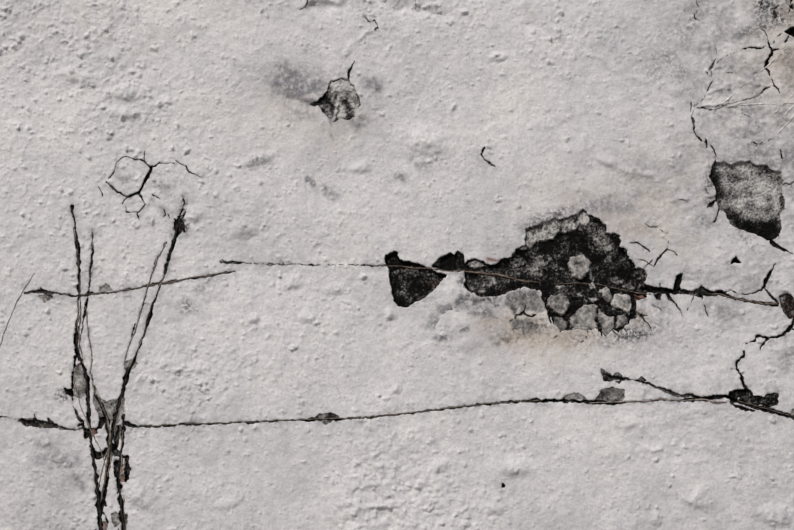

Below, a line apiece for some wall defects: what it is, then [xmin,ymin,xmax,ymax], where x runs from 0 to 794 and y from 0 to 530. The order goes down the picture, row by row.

flaking render [310,78,361,122]
crack [690,0,790,165]
flaking render [709,161,785,240]
flaking render [385,209,650,336]
crack [0,150,794,530]